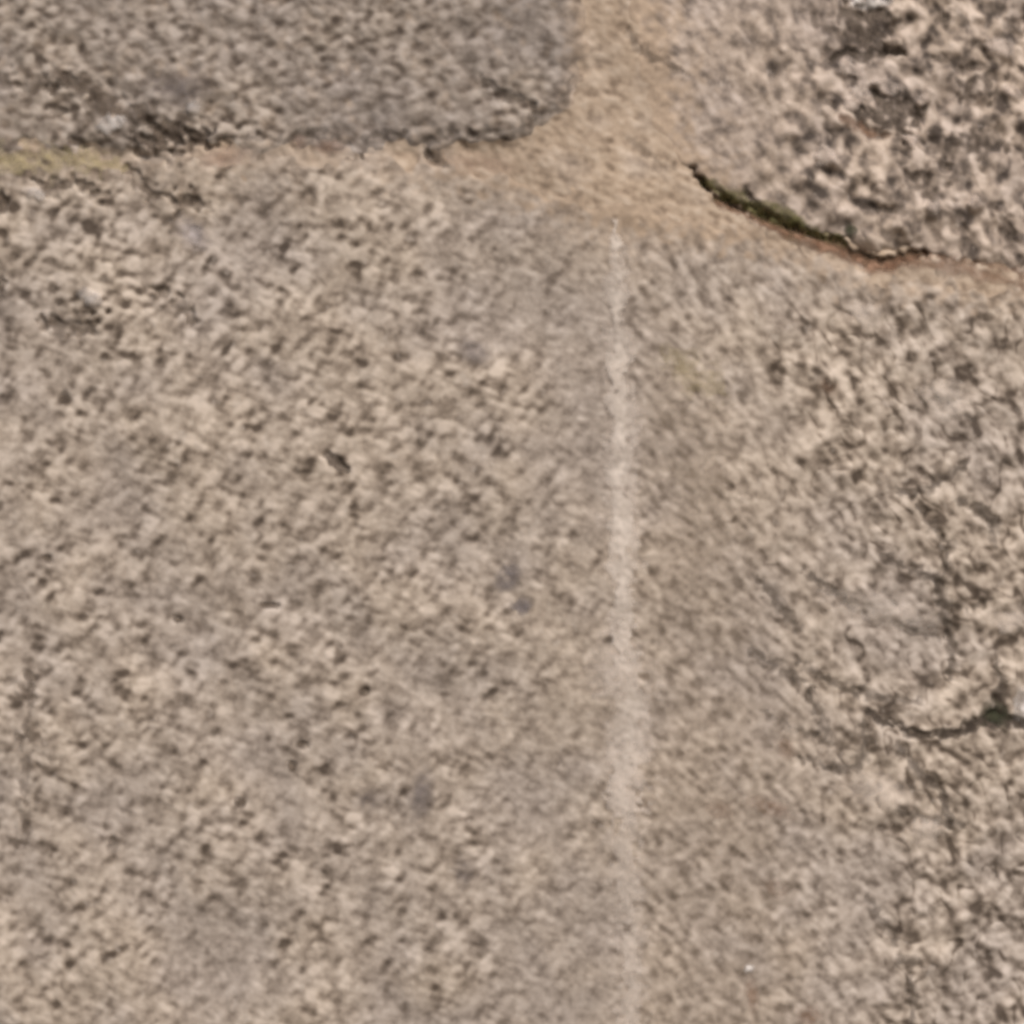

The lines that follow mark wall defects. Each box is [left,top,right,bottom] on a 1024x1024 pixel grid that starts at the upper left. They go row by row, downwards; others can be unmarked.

crack [689,167,944,267]
crack [825,662,1024,827]